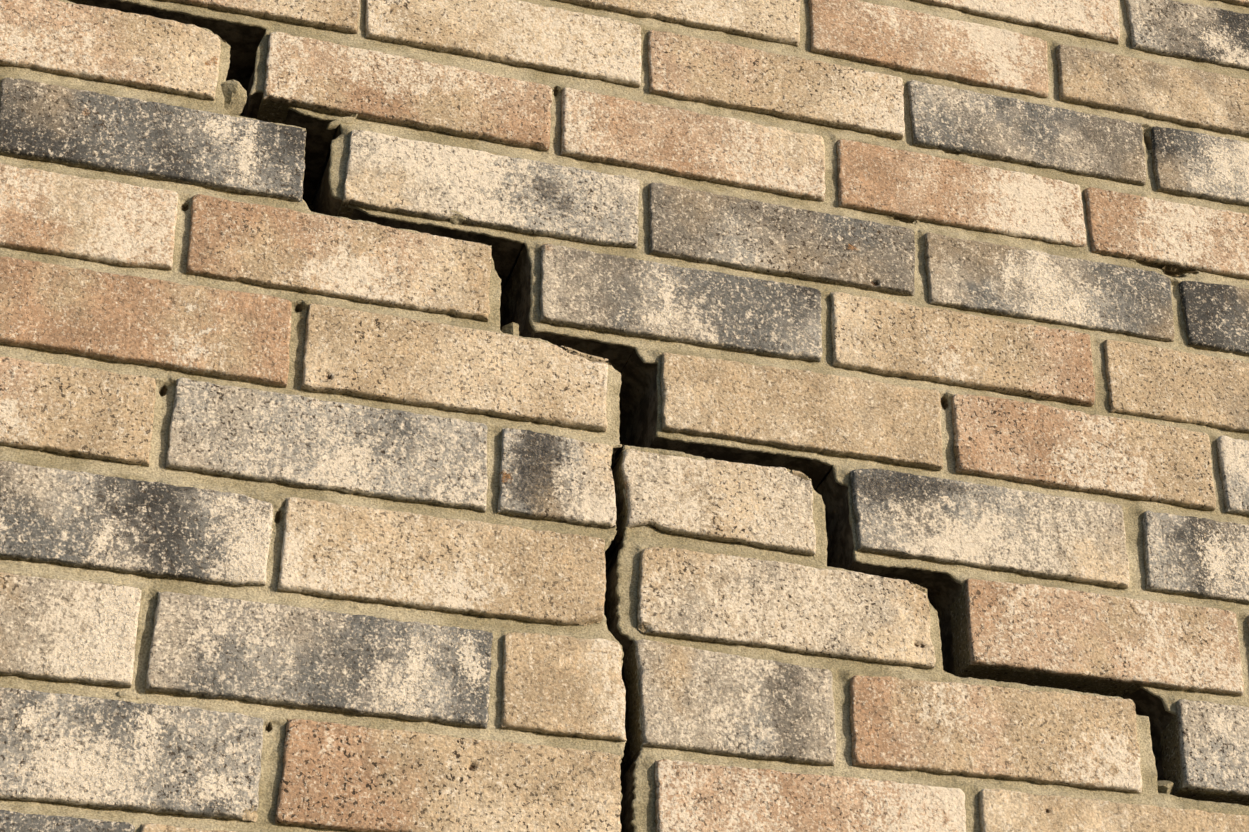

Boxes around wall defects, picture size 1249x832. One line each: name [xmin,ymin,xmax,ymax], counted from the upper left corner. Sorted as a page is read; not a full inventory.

crack [86,0,969,832]
crack [1121,688,1174,781]